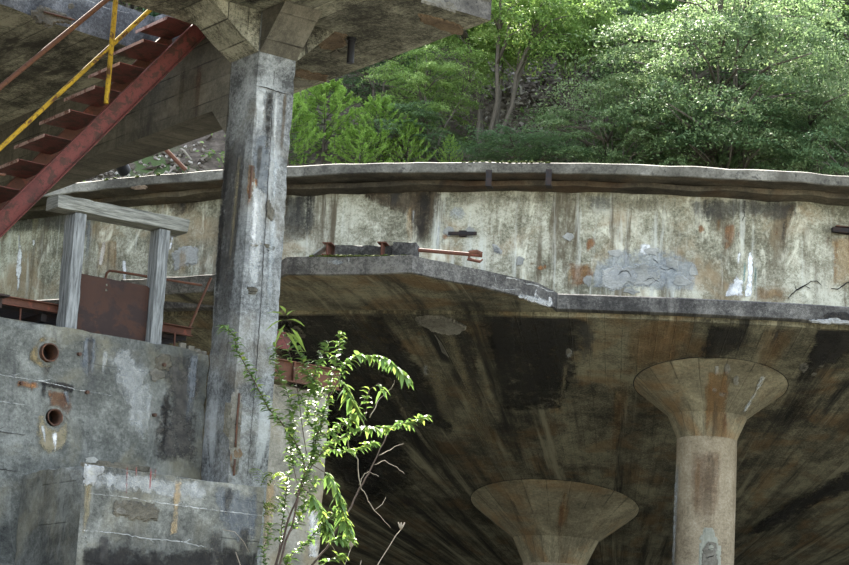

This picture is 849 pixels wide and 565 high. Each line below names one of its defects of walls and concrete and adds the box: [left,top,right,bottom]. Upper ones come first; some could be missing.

spalling [31,3,75,28]
peeling [583,248,698,295]
efflorescence [726,252,756,297]
crack [788,281,849,298]
spalling [701,541,718,565]